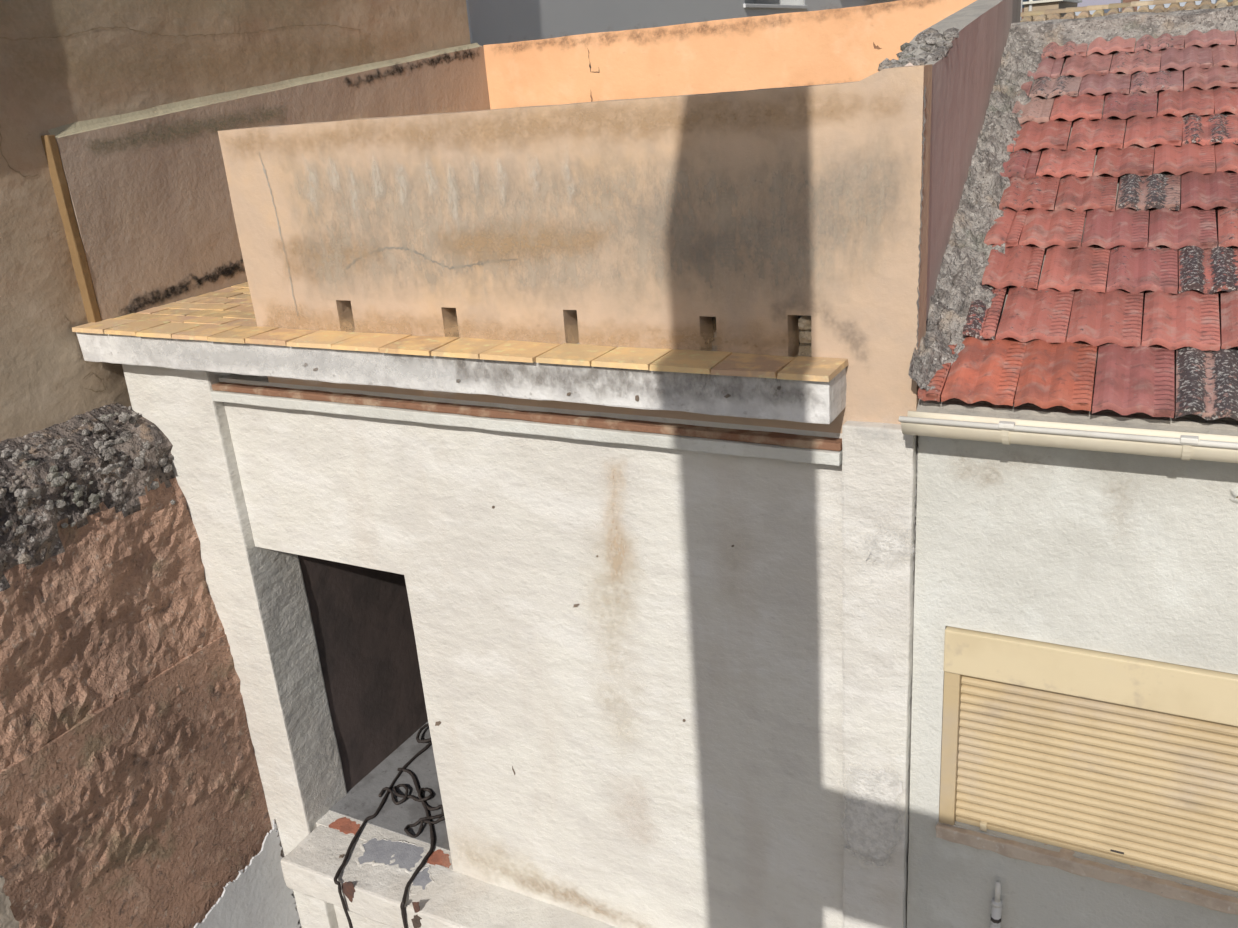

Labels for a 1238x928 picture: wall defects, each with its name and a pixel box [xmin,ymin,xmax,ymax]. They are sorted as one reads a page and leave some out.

crack [0,14,360,41]
mould [346,50,475,84]
spalling [878,27,959,71]
leakage [292,168,816,285]
spalling [1228,485,1238,504]
spalling [0,403,253,928]